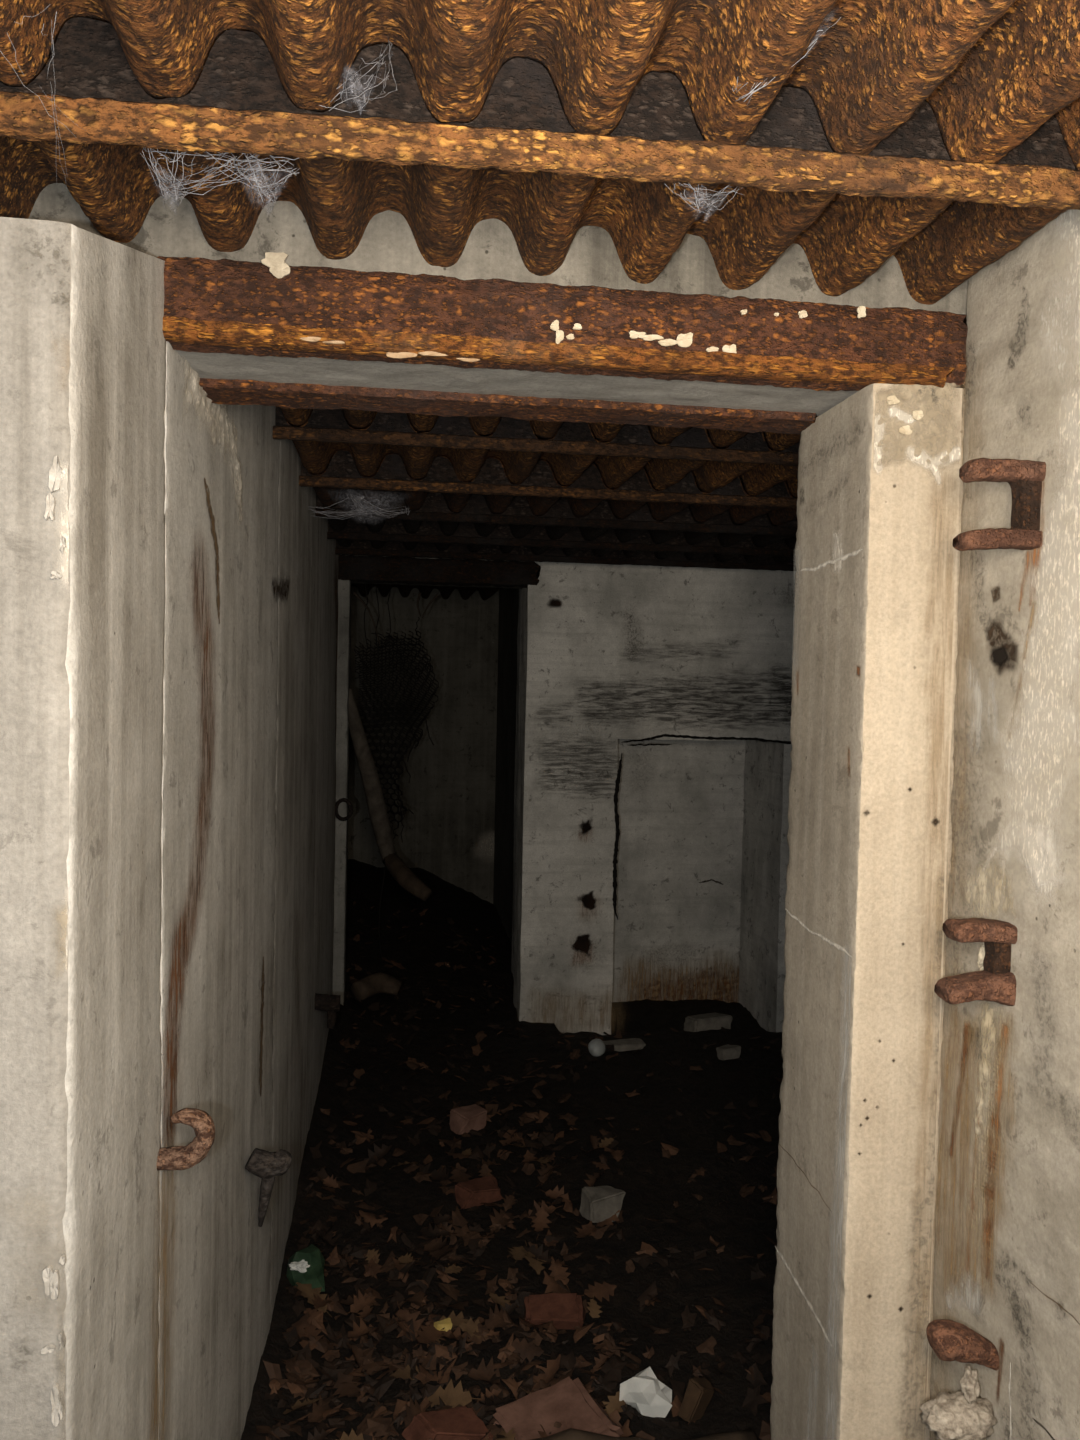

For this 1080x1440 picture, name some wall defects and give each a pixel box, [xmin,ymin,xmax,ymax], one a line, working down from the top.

crack [612,734,791,920]
rust [937,1003,1012,1308]
crack [1031,1283,1079,1324]
crack [1008,1363,1055,1440]